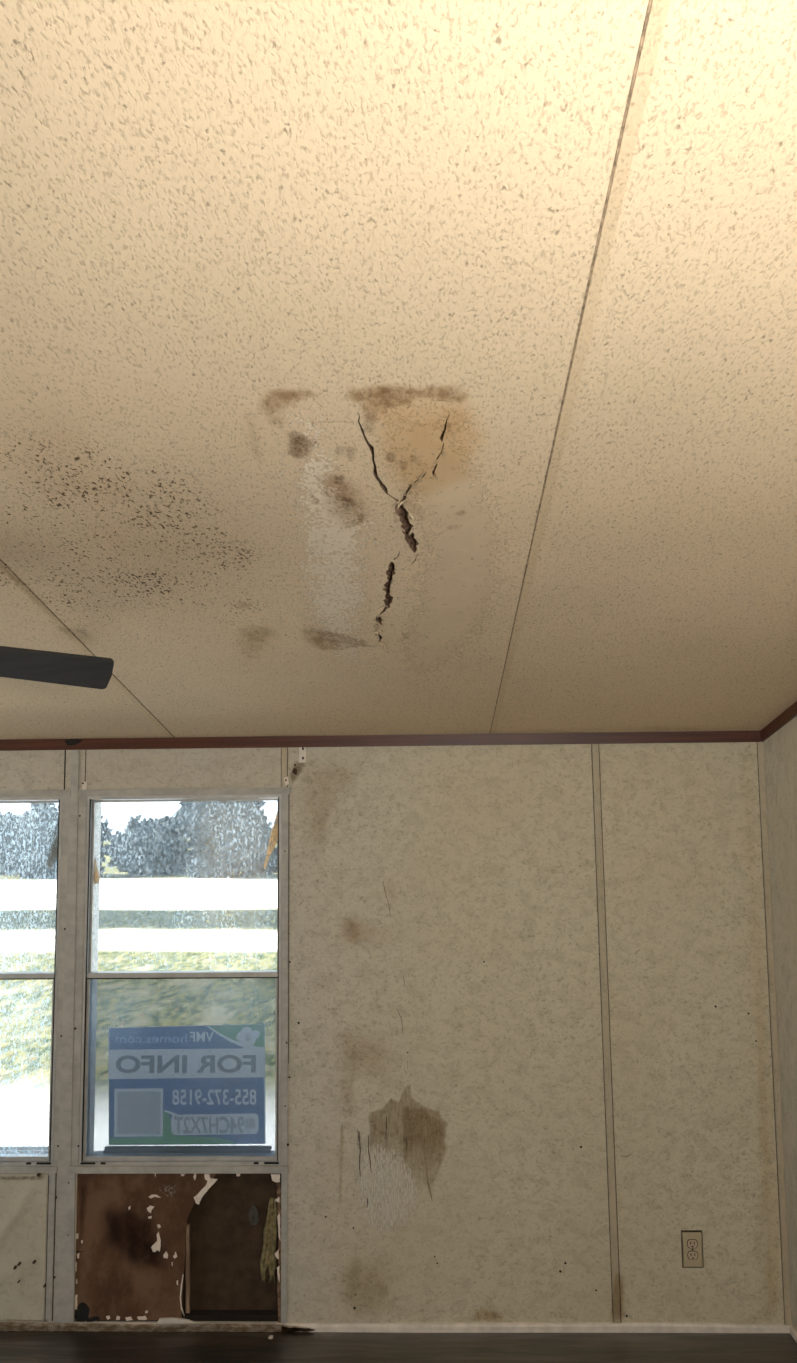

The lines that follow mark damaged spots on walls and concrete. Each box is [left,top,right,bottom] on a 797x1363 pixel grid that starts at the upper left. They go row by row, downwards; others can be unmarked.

crack [357,412,450,650]
spalling [96,1310,158,1321]
spalling [147,1174,315,1333]
leakage [351,1116,433,1235]